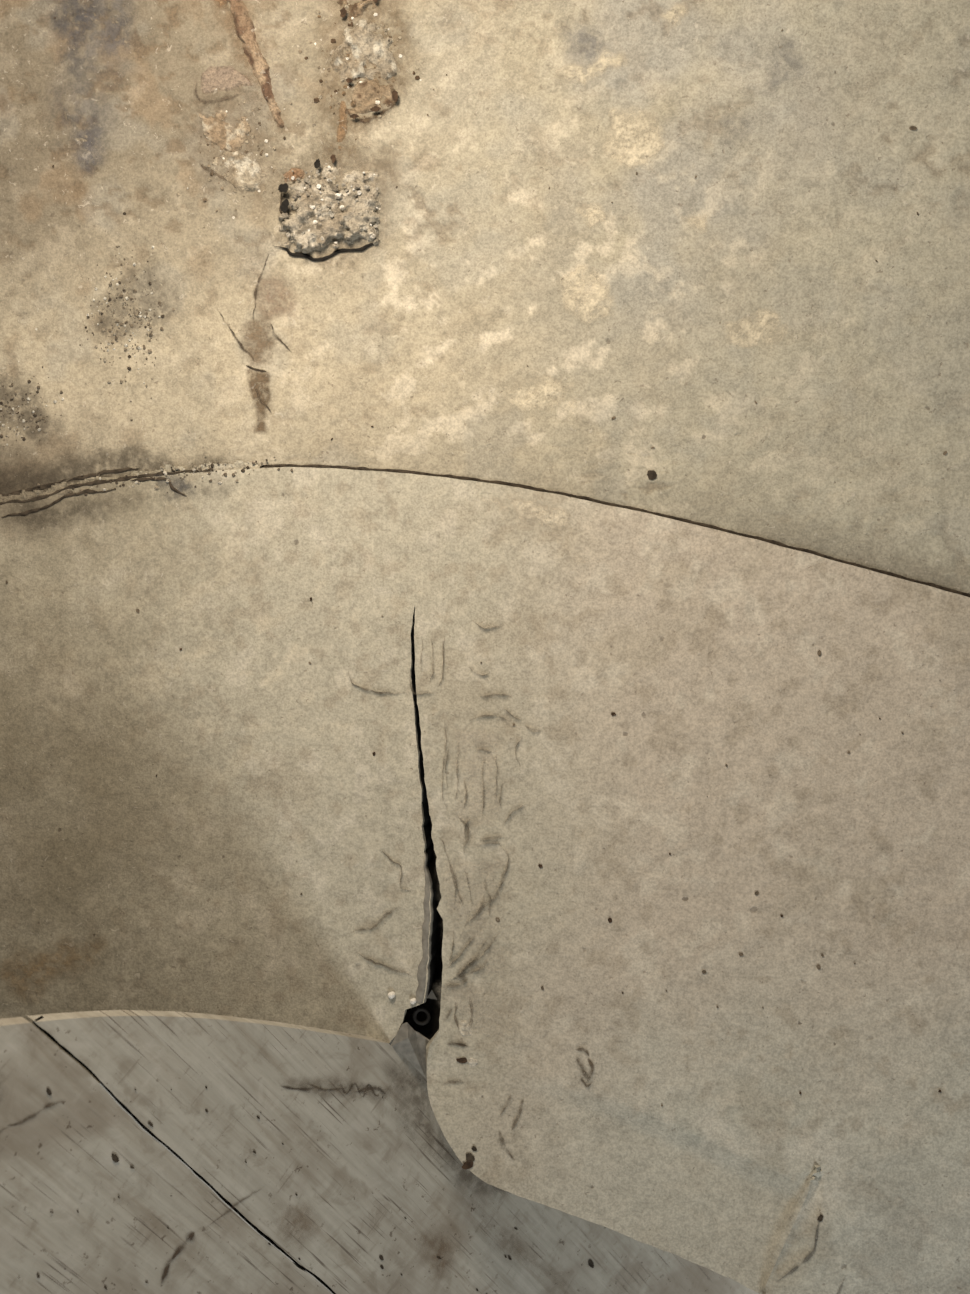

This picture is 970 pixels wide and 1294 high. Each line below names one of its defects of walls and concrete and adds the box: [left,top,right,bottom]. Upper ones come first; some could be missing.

rust [215,0,284,128]
spalling [298,0,434,163]
water stain [245,290,285,431]
crack [0,453,970,597]
crack [351,609,445,1003]
crack [32,1016,336,1294]